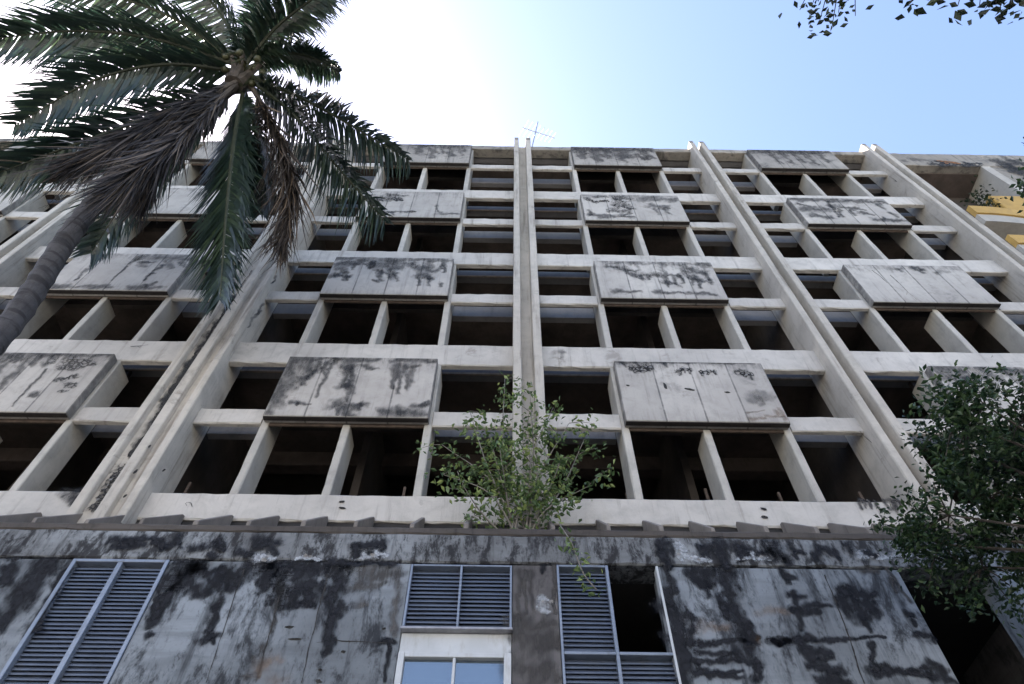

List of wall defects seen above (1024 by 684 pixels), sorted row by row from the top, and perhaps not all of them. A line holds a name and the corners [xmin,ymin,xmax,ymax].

water stain [51,256,164,289]
water stain [329,260,447,286]
water stain [606,266,717,296]
water stain [0,353,112,403]
water stain [265,357,436,417]
water stain [0,556,74,634]
water stain [106,533,404,683]
water stain [654,536,959,684]